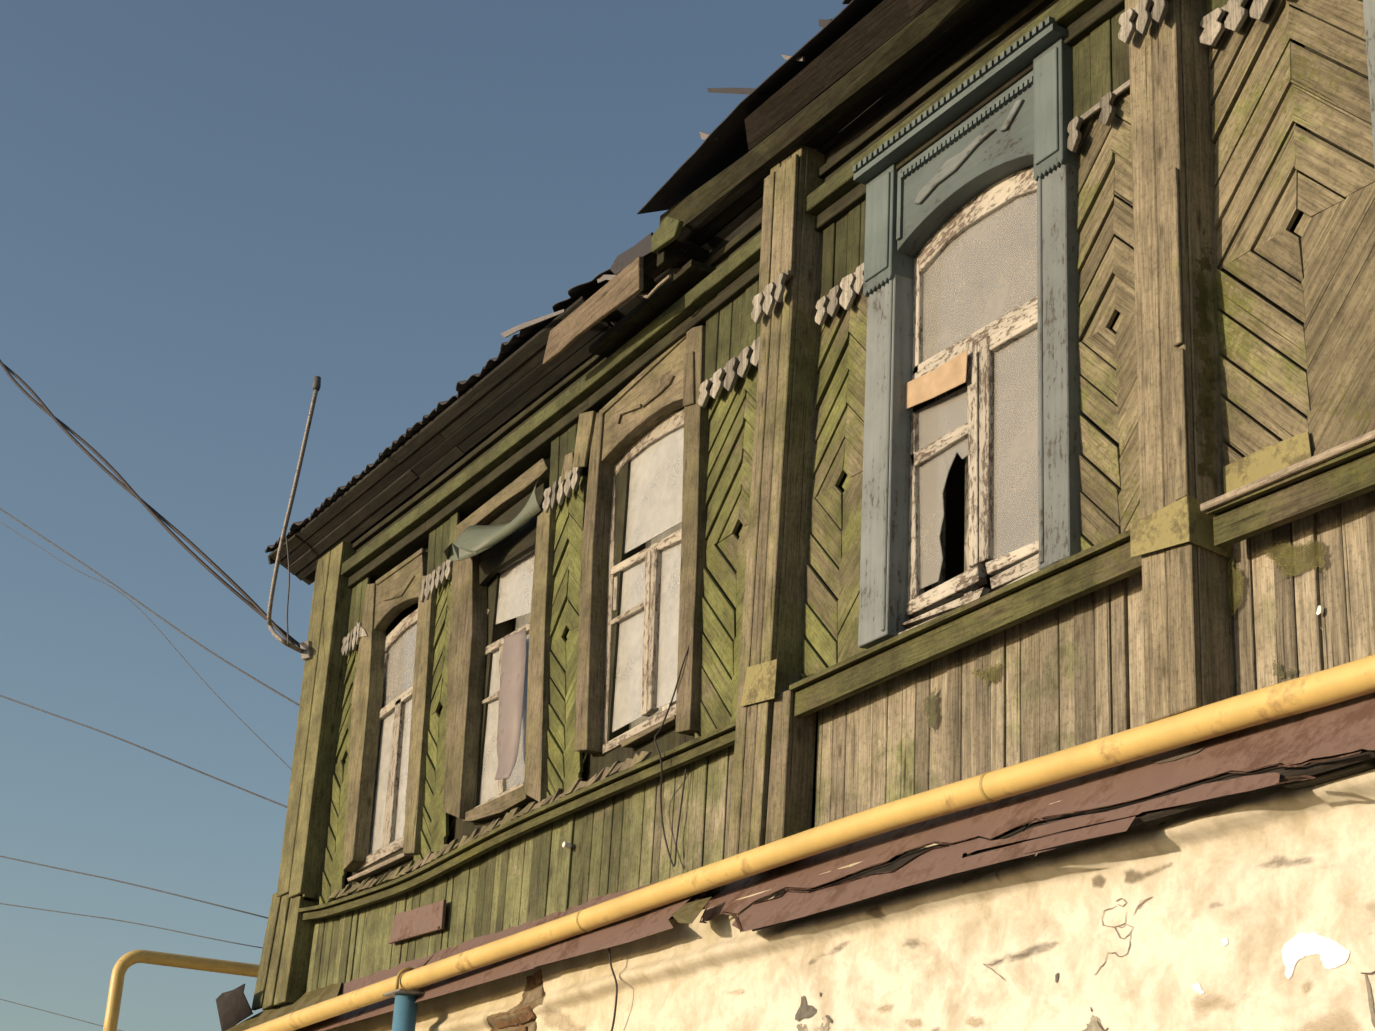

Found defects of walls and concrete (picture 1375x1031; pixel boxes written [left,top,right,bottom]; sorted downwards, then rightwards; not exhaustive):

flaking render [487,970,546,1031]
flaking render [795,992,833,1031]
flaking render [1082,1007,1108,1031]